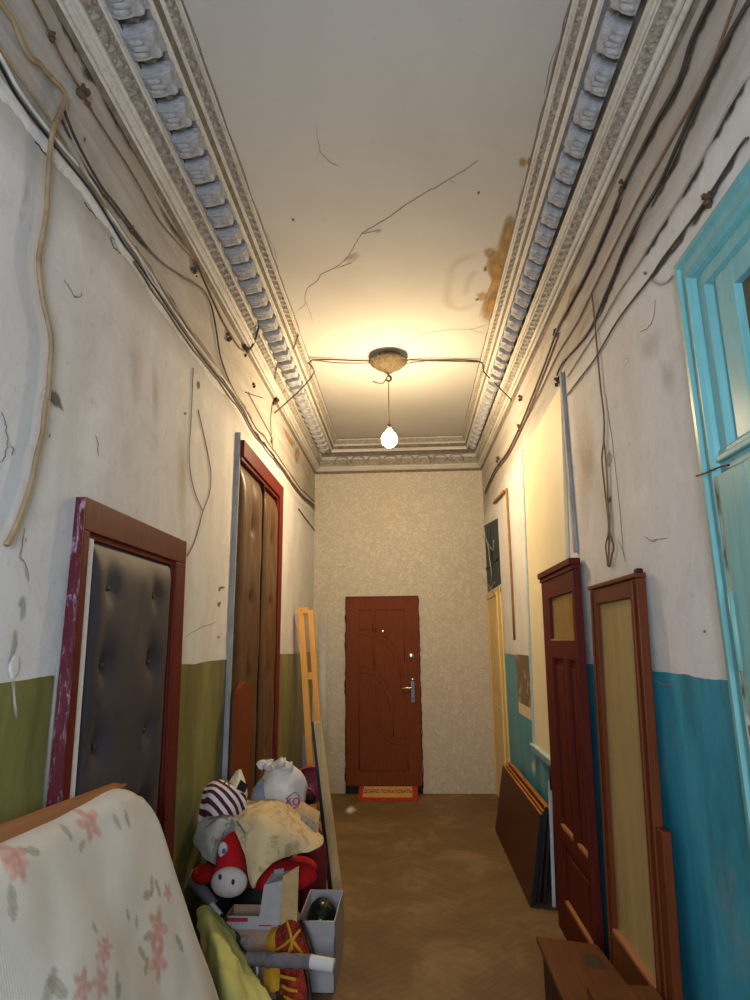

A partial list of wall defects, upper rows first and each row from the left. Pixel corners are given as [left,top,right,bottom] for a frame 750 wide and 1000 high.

crack [182,0,479,422]
water stain [479,224,512,316]
crack [0,412,14,463]